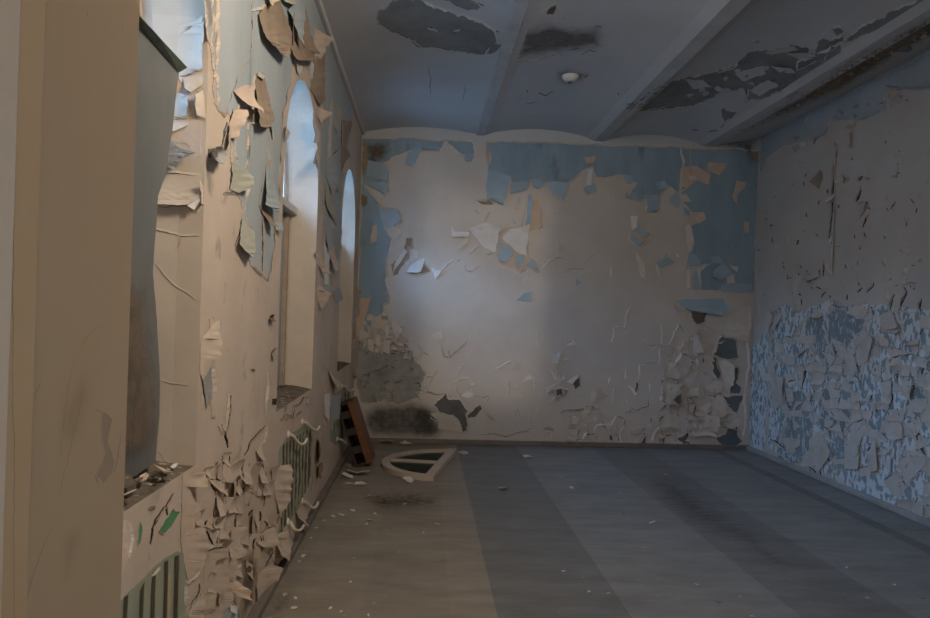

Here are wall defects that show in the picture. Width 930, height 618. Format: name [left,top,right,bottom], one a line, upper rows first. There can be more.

leakage [368,408,438,433]